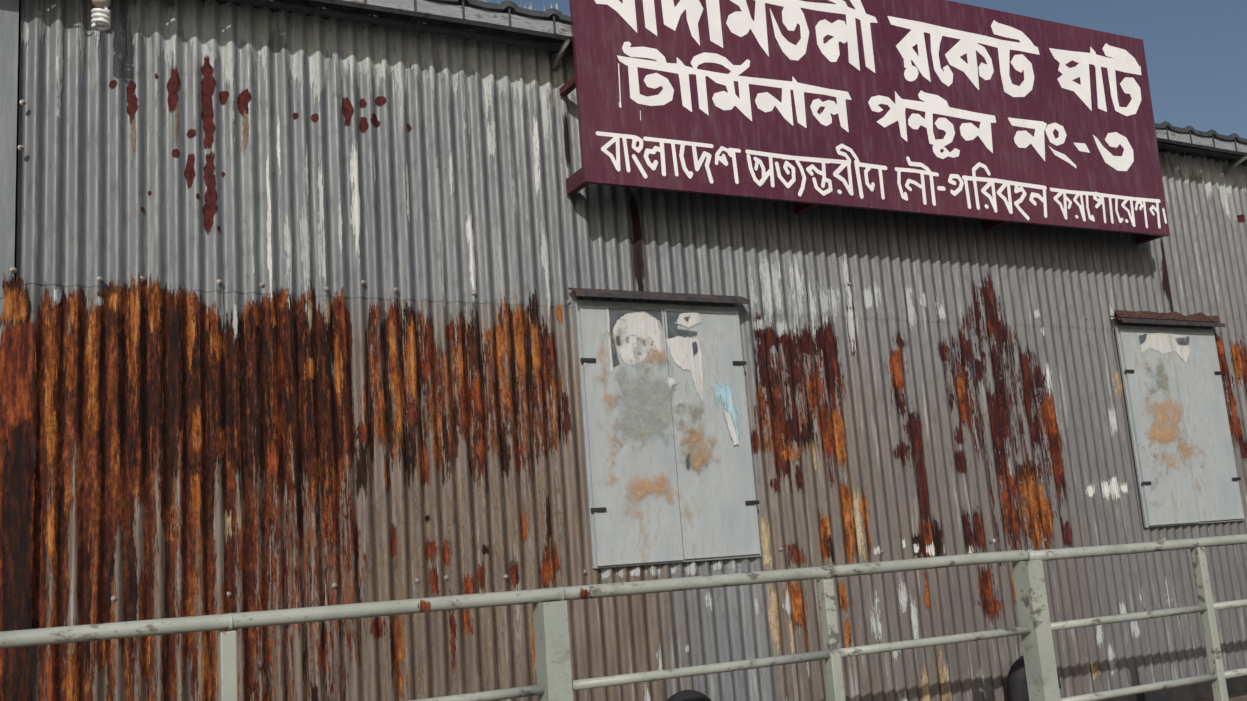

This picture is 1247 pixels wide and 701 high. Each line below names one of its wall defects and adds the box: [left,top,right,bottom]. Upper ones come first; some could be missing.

rust [109,80,138,156]
rust [155,56,251,235]
rust [342,96,386,133]
peeling [1164,152,1247,222]
rust [0,272,591,701]
rust [746,287,871,654]
rust [884,329,945,610]
rust [938,269,1073,624]
rust [1114,241,1247,461]